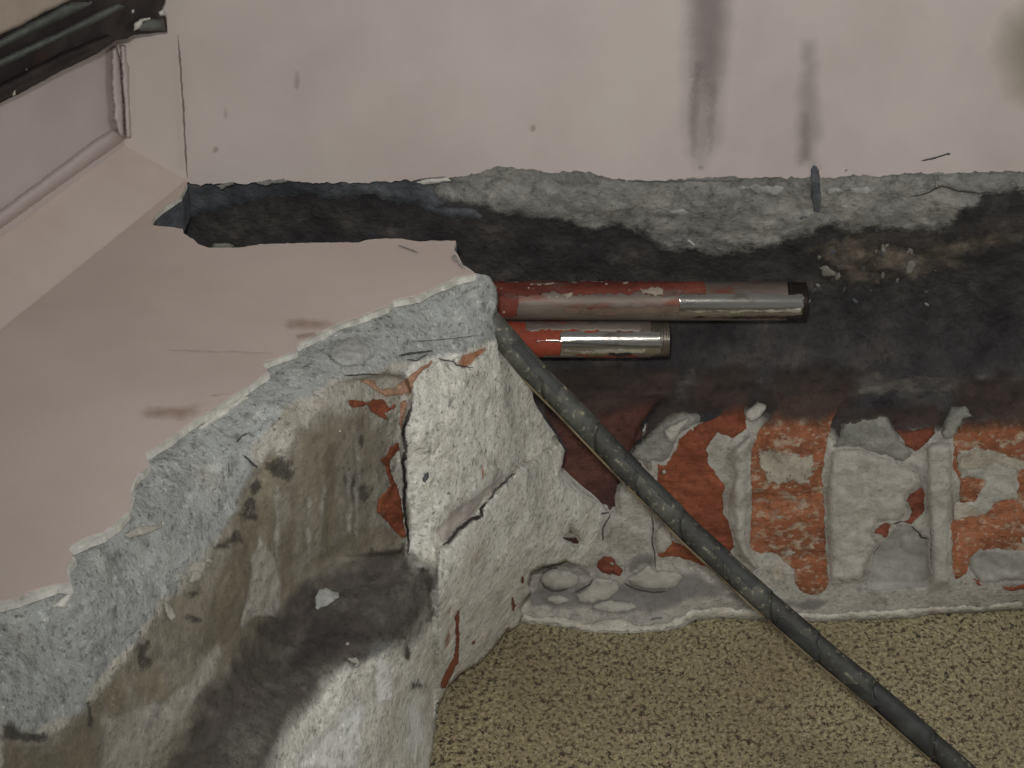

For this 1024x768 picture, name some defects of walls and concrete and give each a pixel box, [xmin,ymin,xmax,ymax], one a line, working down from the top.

flaking render [187,166,1024,256]
crack [345,370,380,378]
flaking render [348,360,432,429]
crack [399,335,473,368]
rust [458,349,486,368]
crack [401,402,413,555]
flaking render [545,409,620,510]
flaking render [557,366,758,589]
flaking render [750,368,854,595]
flaking render [950,376,1024,591]
water stain [4,412,435,768]
rust [441,607,475,689]